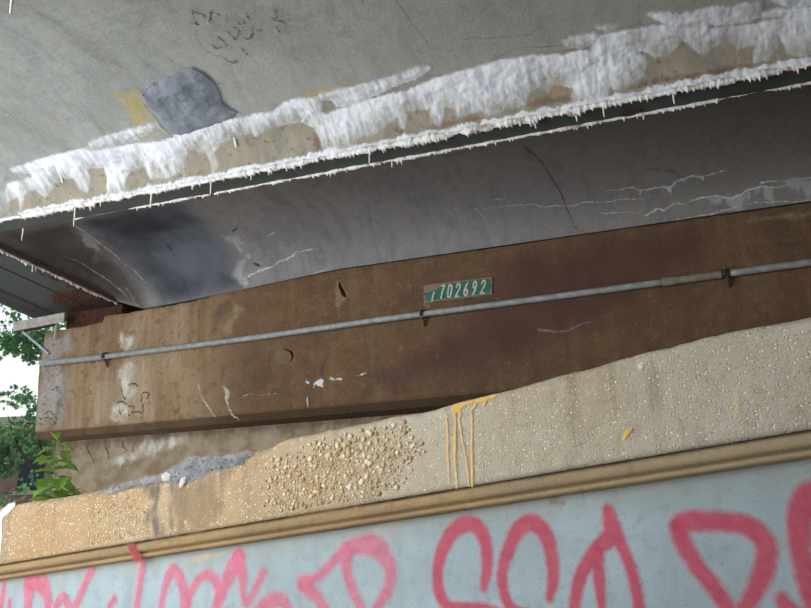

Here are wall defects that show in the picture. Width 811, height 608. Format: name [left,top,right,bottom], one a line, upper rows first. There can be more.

damp [0,0,811,305]
corrosion [41,273,119,312]
peeling [111,436,187,464]
spalling [87,452,250,544]
spalling [260,420,425,512]